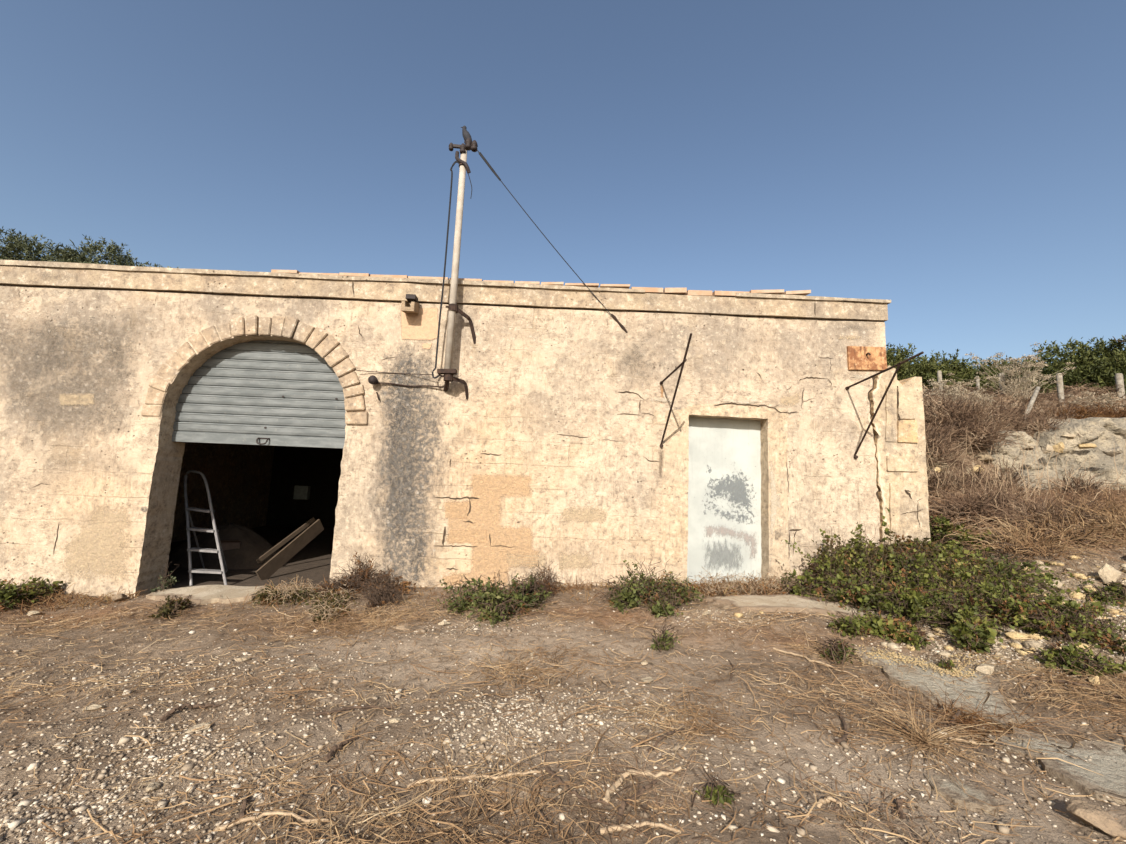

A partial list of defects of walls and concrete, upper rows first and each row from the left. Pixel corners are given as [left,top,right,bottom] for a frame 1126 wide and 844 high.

damp [374,347,446,585]
crack [717,357,923,534]